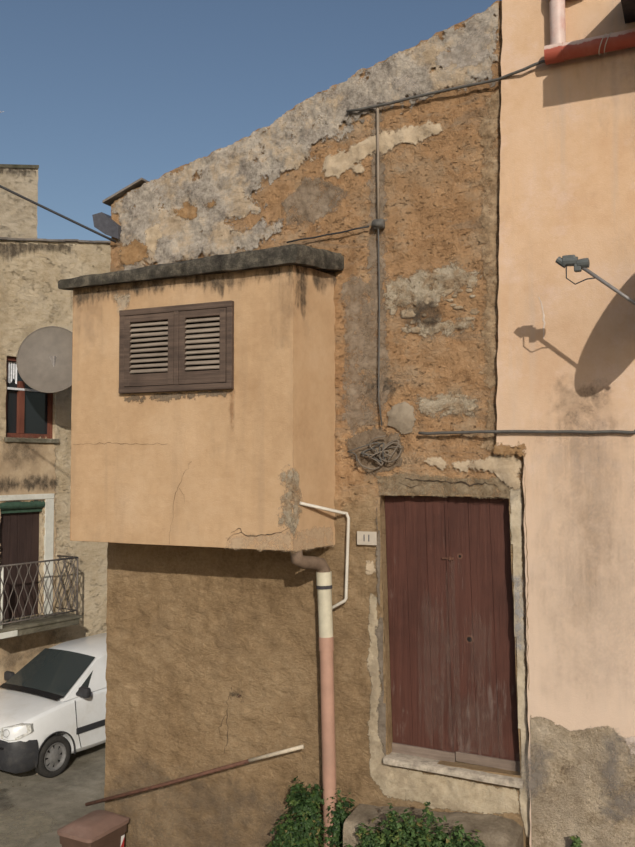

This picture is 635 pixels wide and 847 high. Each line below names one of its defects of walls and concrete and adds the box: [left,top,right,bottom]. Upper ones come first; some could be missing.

peeling [112,3,499,271]
leakage [0,242,70,256]
leakage [76,280,163,310]
spalling [383,261,482,339]
spalling [278,465,303,535]
peeling [424,441,527,490]
peeling [365,559,376,576]
peeling [367,593,520,815]
spalling [522,716,635,847]